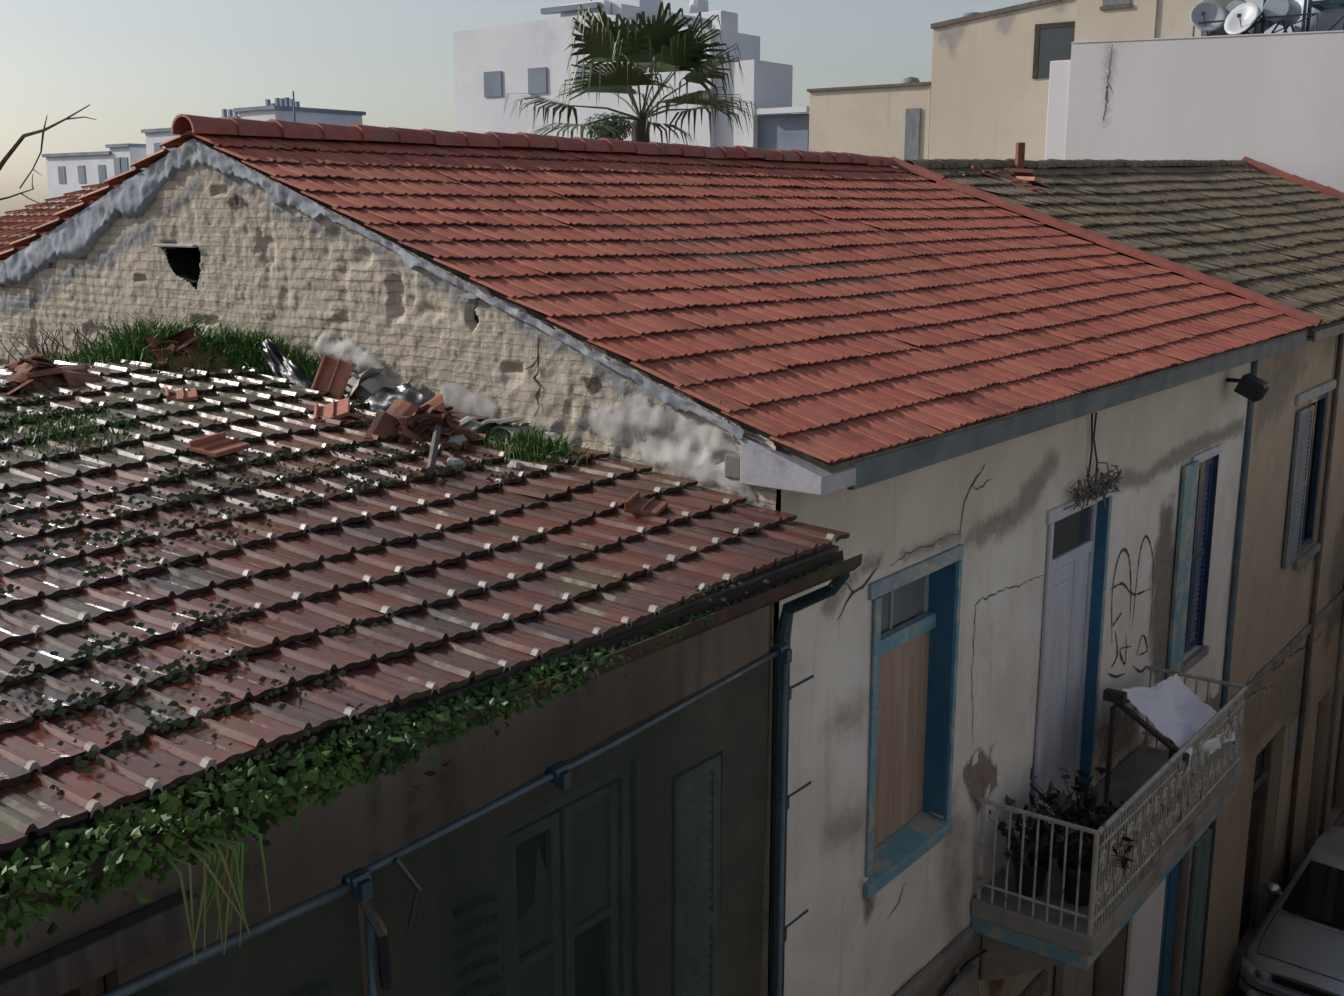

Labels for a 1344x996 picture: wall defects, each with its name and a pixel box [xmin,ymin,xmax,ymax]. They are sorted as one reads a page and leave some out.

crack [1103,45,1113,121]
spalling [153,243,201,289]
crack [526,337,541,415]
water stain [977,458,1057,542]
crack [837,464,991,620]
crack [971,575,1044,741]
flaking render [963,743,997,814]